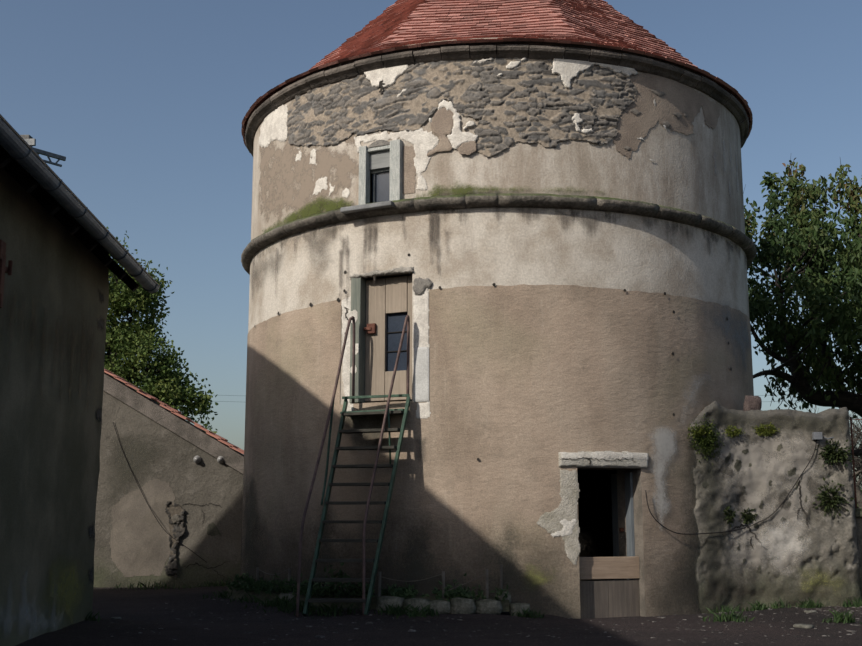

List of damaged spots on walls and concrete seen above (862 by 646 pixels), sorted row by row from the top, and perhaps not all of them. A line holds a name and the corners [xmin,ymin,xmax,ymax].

spalling [259,55,720,220]
water stain [429,212,439,255]
spalling [537,469,580,565]